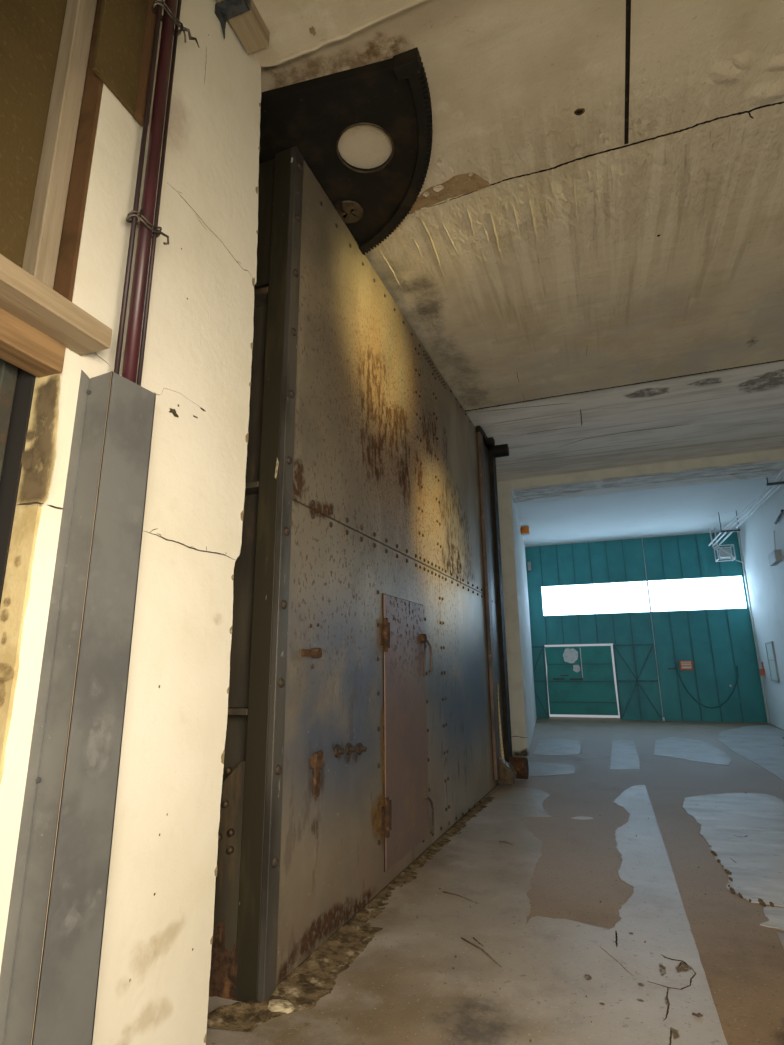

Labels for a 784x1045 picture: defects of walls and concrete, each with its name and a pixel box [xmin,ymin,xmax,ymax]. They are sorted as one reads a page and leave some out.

peeling [407,172,490,217]
crack [427,101,784,208]
rust [358,353,447,504]
water stain [626,388,667,398]
water stain [739,369,784,392]
crack [145,528,235,560]
rust [293,461,333,517]
rust [439,482,473,580]
rust [278,891,371,983]
peeling [204,738,728,1045]
peeling [682,792,784,947]
crack [599,931,696,1045]